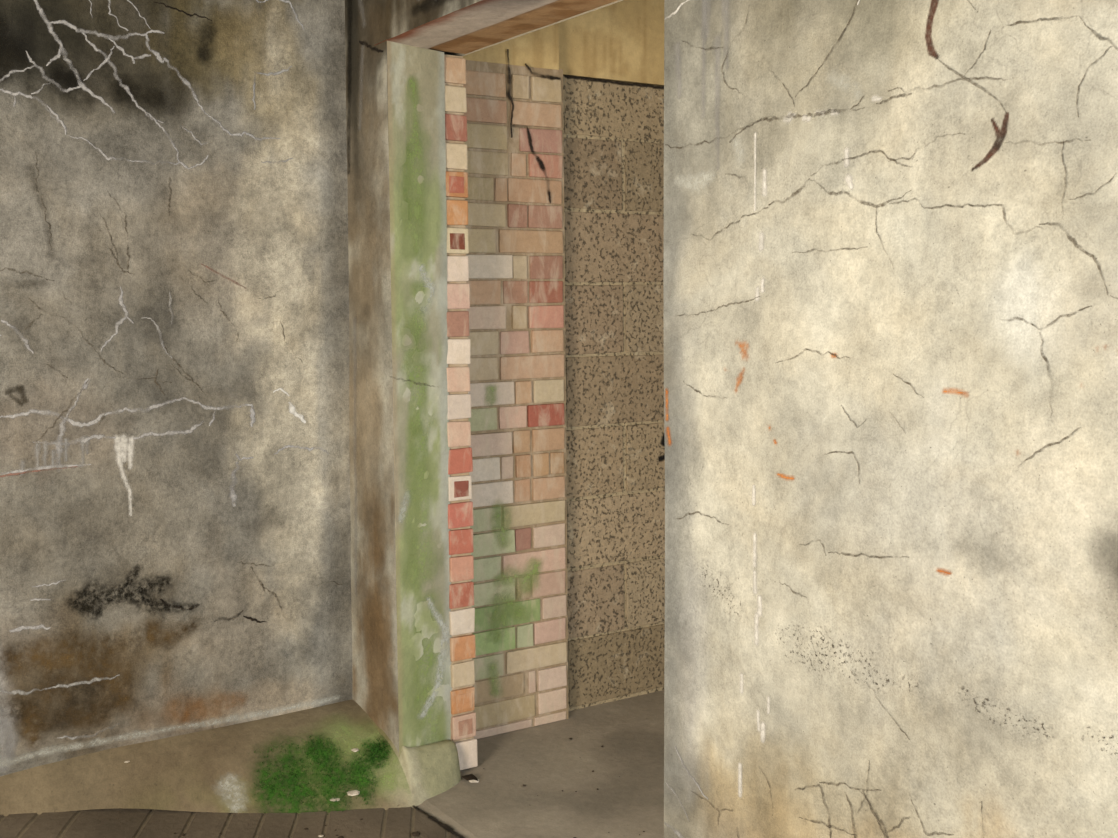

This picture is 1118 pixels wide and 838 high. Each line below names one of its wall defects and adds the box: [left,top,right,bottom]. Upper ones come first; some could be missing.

crack [0,0,293,212]
crack [256,0,304,30]
crack [507,49,664,203]
crack [665,18,1055,149]
crack [830,190,1005,250]
crack [0,216,255,474]
crack [1018,223,1107,362]
leakage [0,636,130,768]